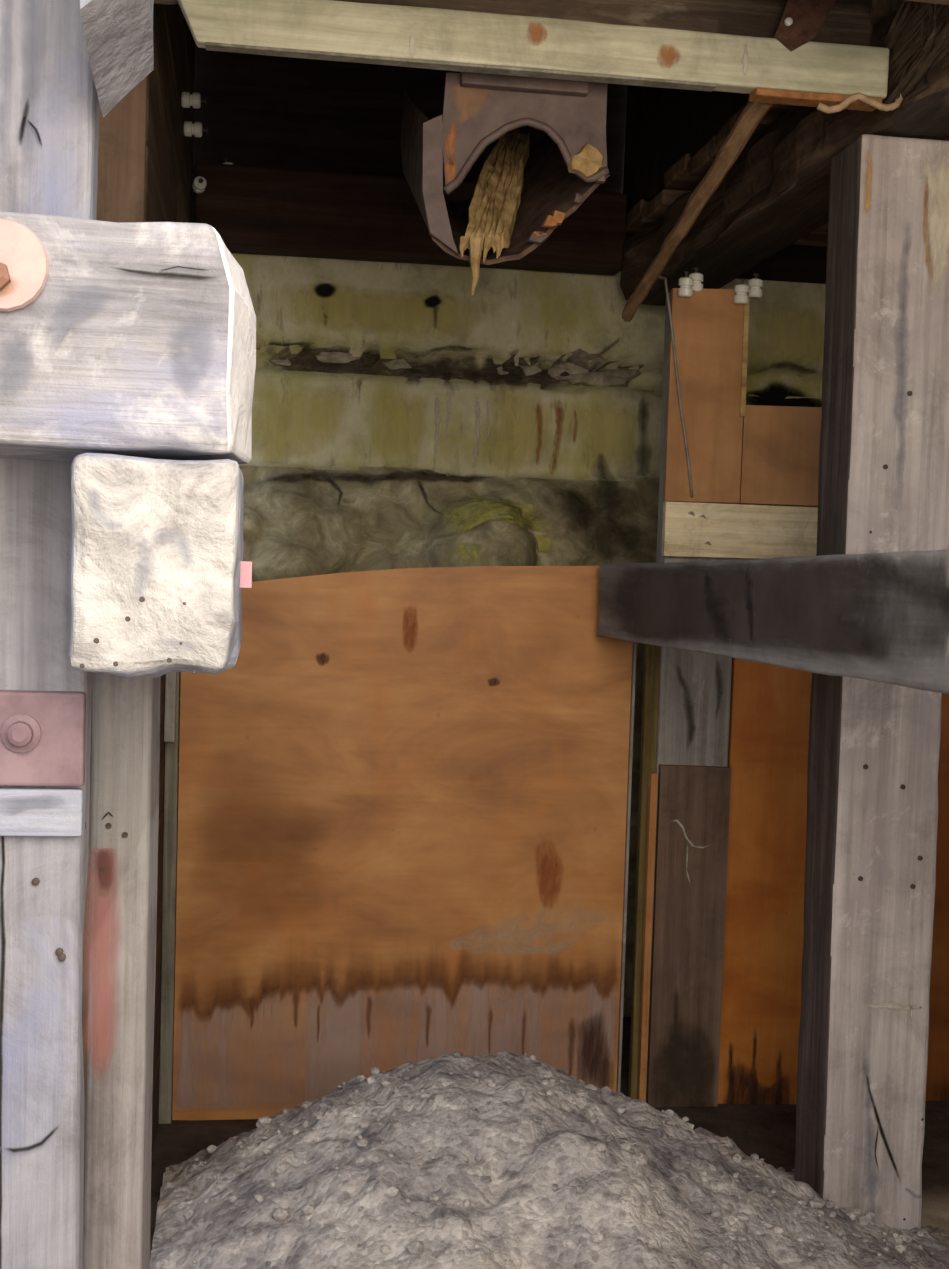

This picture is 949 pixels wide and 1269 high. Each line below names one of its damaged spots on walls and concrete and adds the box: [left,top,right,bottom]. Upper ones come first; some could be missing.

rust [446,87,485,183]
rust [567,143,606,183]
rust [527,193,583,244]
damp [302,291,455,333]
spalling [497,348,643,387]
damp [177,966,615,1107]
damp [726,1037,788,1105]